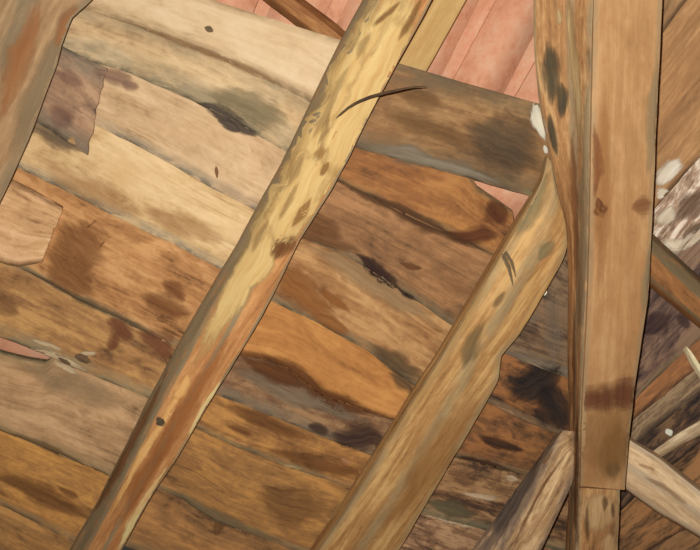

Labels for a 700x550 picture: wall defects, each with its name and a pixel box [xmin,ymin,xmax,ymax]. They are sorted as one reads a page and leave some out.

damp [199,92,280,136]
damp [548,118,557,153]
damp [542,48,567,117]
damp [679,194,700,238]
damp [302,216,423,313]
damp [513,366,579,540]